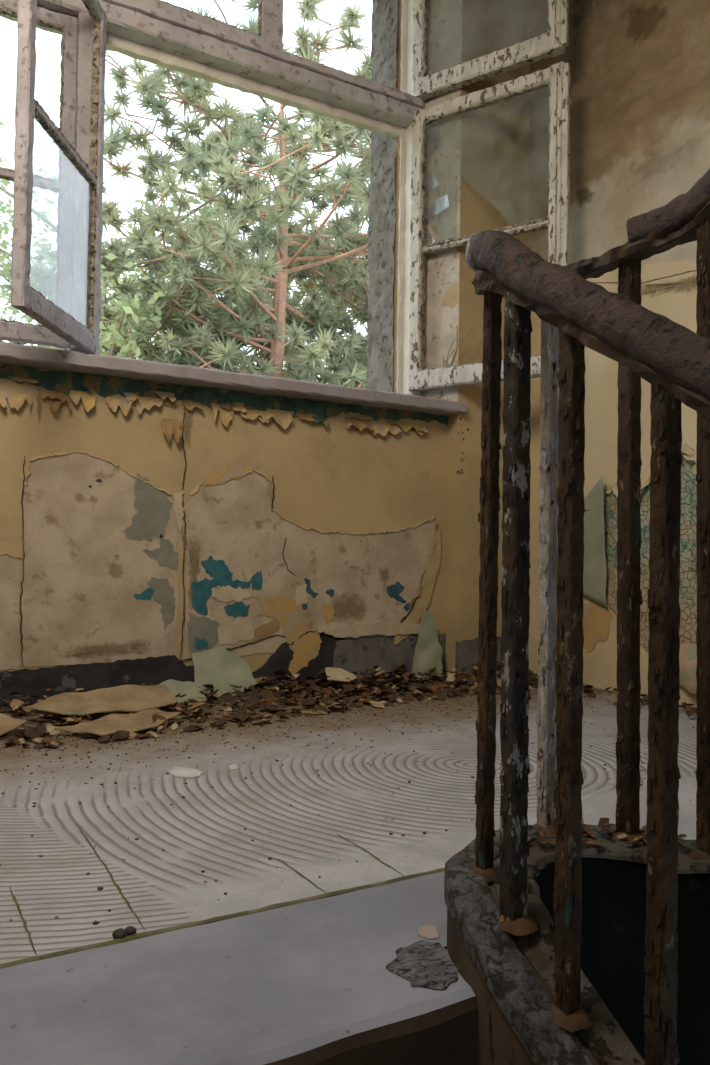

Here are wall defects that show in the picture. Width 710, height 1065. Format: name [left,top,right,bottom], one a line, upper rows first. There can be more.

peeling [0,376,315,444]
peeling [345,412,429,437]
crack [178,406,190,663]
peeling [0,450,441,670]
peeling [583,475,618,616]
peeling [640,476,650,653]
peeling [679,443,697,644]